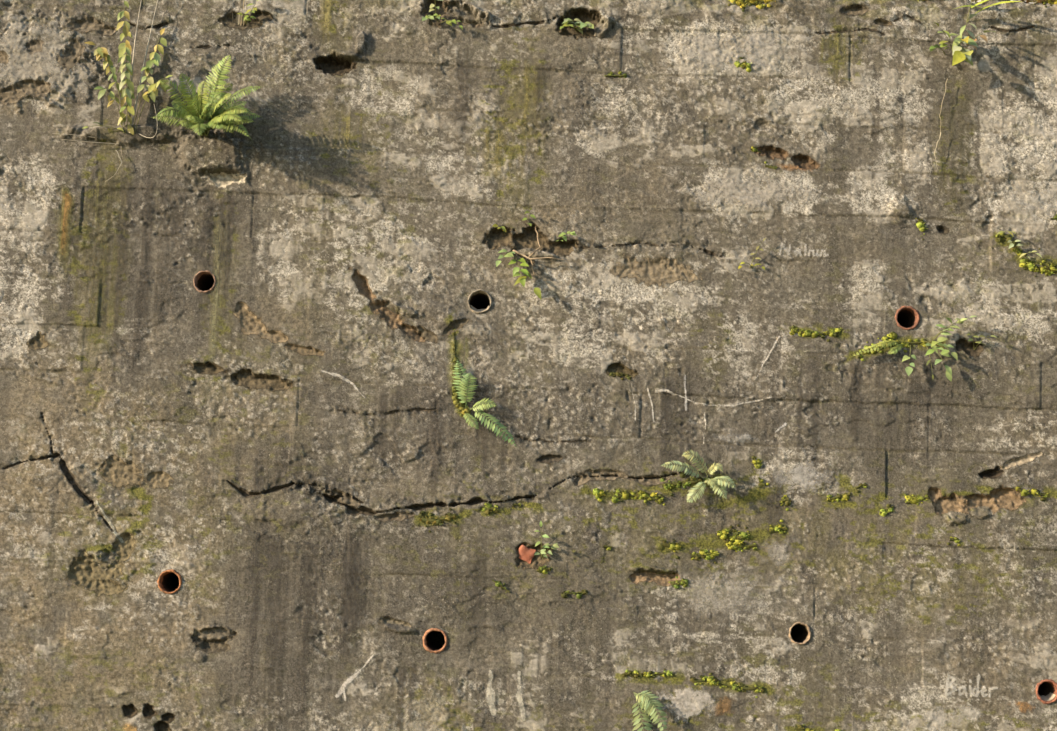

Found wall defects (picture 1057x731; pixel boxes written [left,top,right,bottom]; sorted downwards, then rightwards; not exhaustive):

spalling [754,146,820,169]
spalling [349,268,472,344]
spalling [233,302,325,356]
crack [3,413,114,532]
crack [227,472,686,516]
spalling [928,485,1026,525]
spalling [998,452,1043,470]
damp [335,654,374,701]
spalling [122,704,175,731]